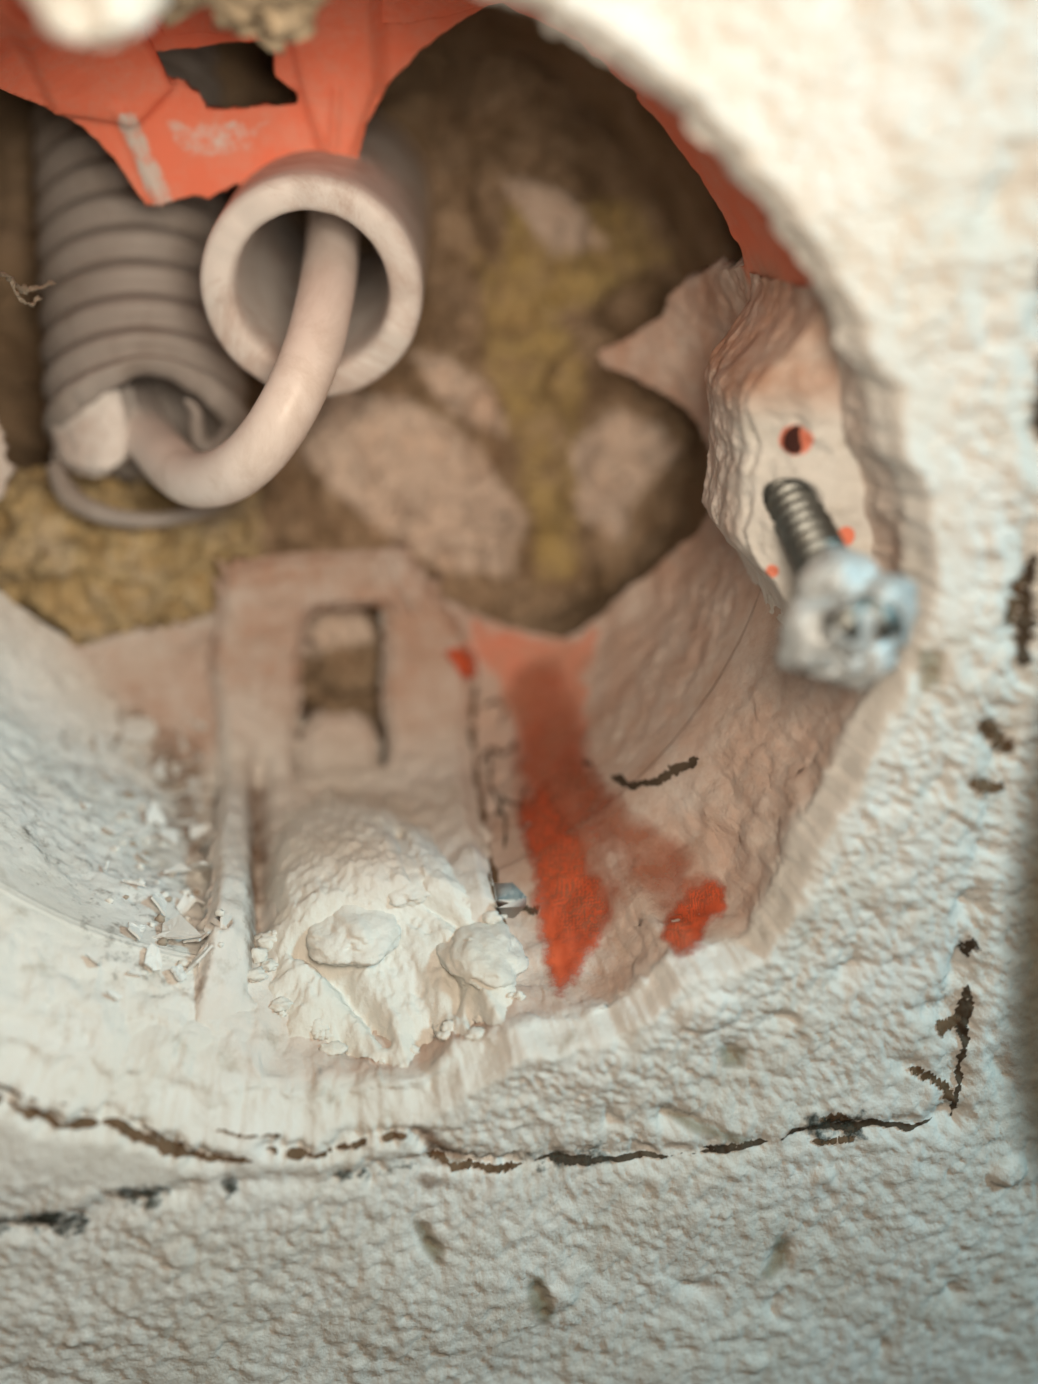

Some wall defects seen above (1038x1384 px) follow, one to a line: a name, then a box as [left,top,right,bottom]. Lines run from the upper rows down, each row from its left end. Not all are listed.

spalling [213,41,298,108]
spalling [375,3,742,279]
spalling [0,89,54,473]
spalling [292,210,309,235]
spalling [359,230,376,254]
spalling [664,437,709,559]
crack [0,936,982,1174]